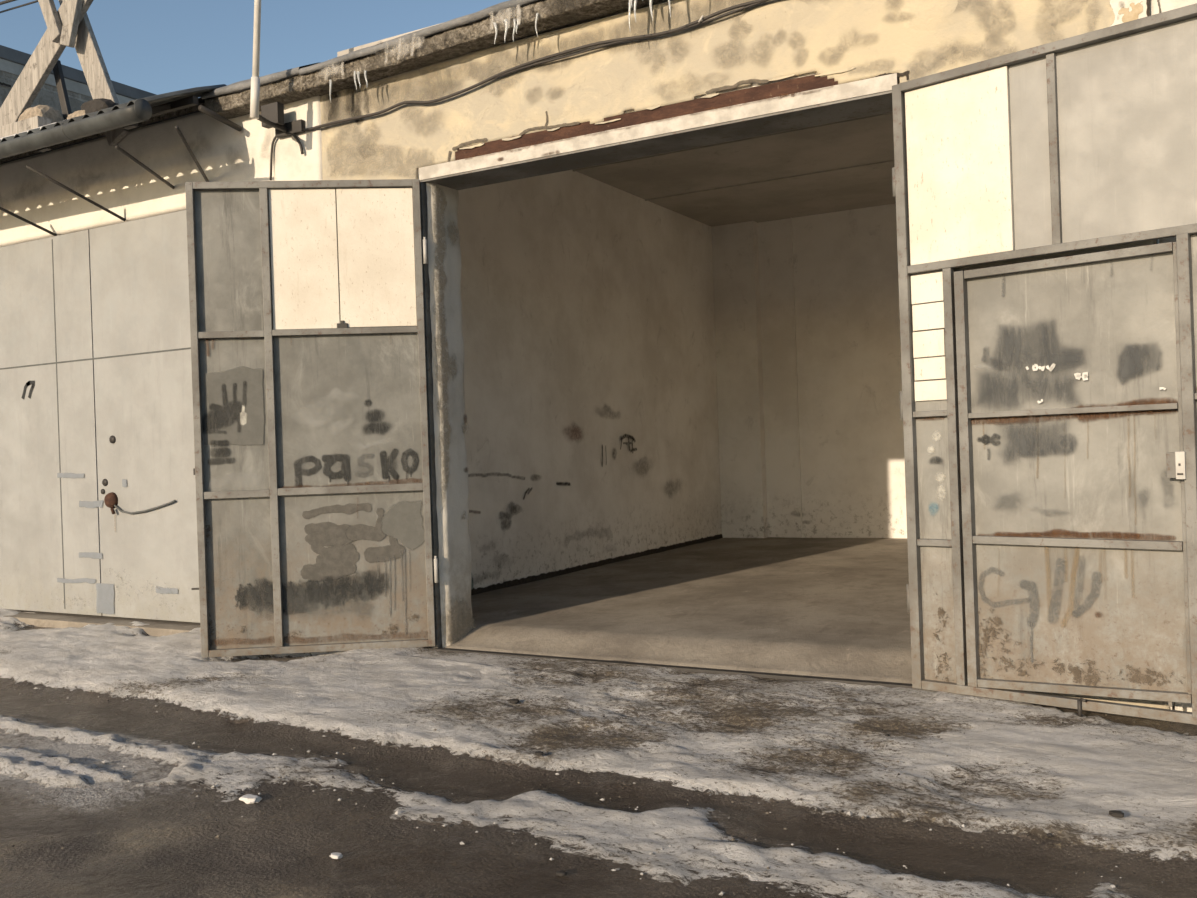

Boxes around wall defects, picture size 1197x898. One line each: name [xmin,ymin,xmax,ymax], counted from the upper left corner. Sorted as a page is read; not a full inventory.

peeling [1109,0,1147,27]
corrosion [979,529,1174,540]